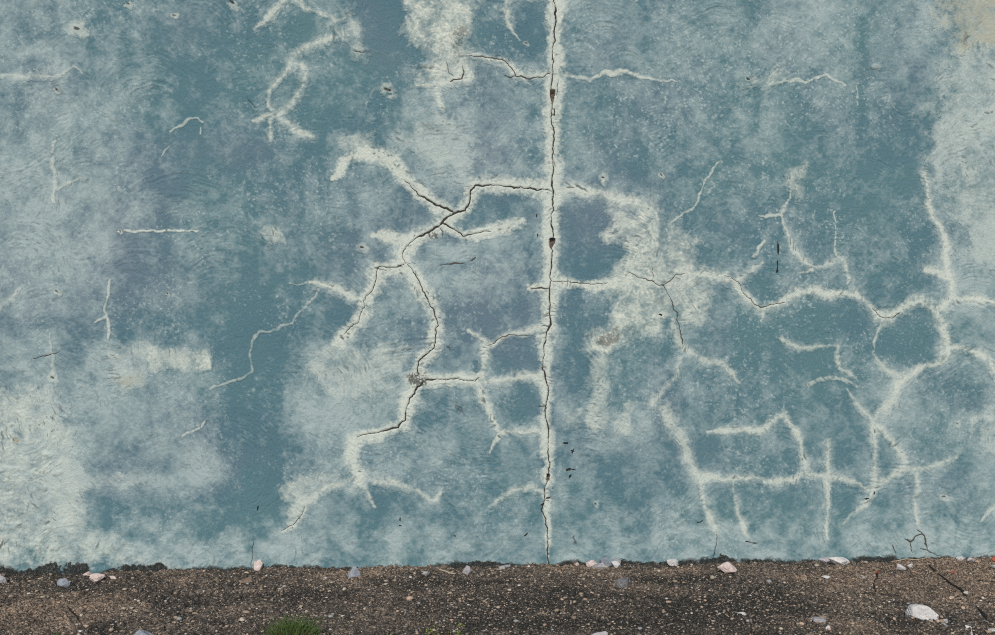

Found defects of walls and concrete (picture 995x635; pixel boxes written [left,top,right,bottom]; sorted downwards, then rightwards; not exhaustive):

damp [169,117,205,135]
crack [343,0,608,564]
damp [209,0,995,569]
crack [630,268,684,345]
damp [0,331,316,576]